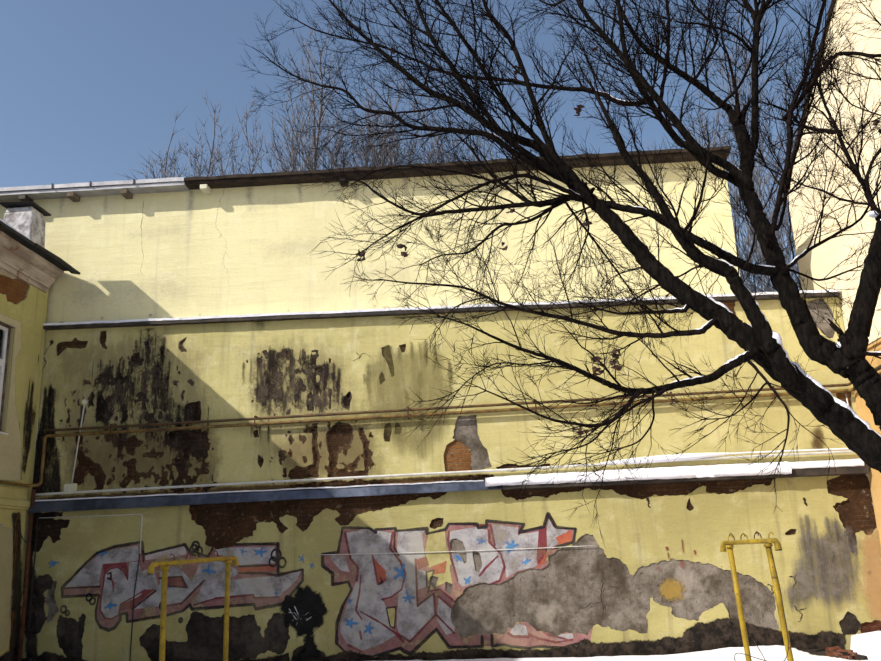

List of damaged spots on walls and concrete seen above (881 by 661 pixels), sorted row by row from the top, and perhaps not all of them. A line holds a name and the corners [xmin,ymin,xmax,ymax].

water stain [22,382,61,493]
spalling [60,338,217,493]
water stain [92,328,209,466]
water stain [242,347,343,414]
spalling [258,348,352,415]
spalling [189,415,550,549]
spalling [501,478,774,511]
spalling [826,474,877,553]
flaking render [35,574,86,659]
flaking render [139,611,290,661]
flaking render [429,534,779,639]
water stain [788,518,881,619]